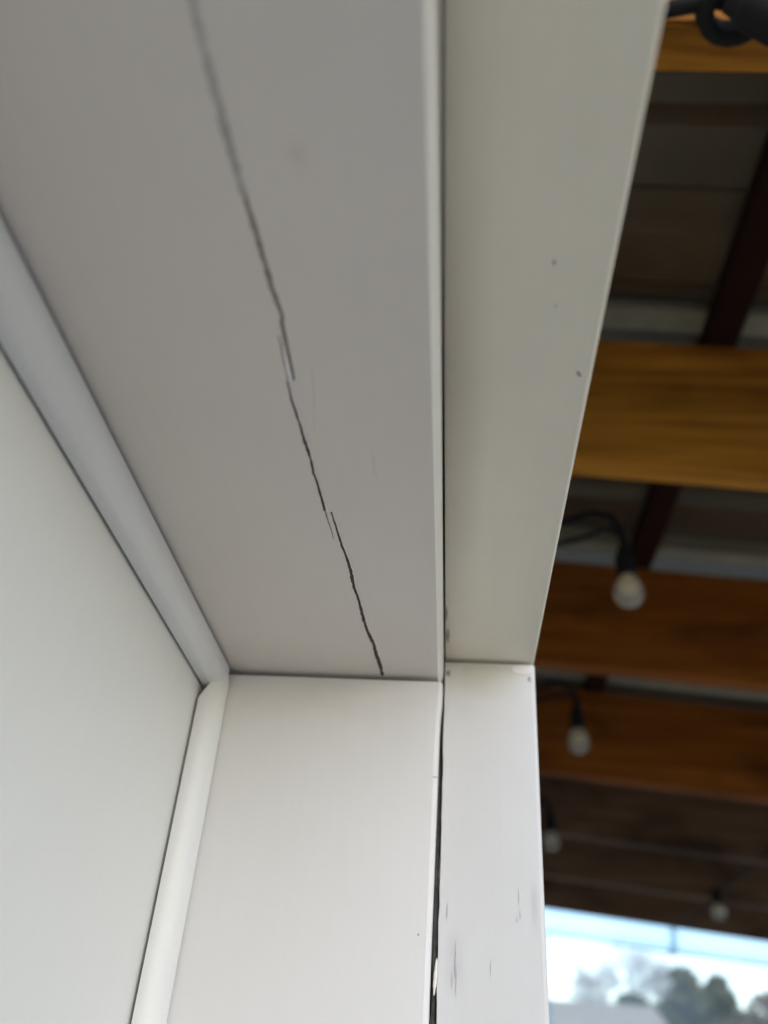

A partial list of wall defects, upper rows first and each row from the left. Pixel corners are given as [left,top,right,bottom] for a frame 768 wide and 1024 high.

crack [188,0,385,676]